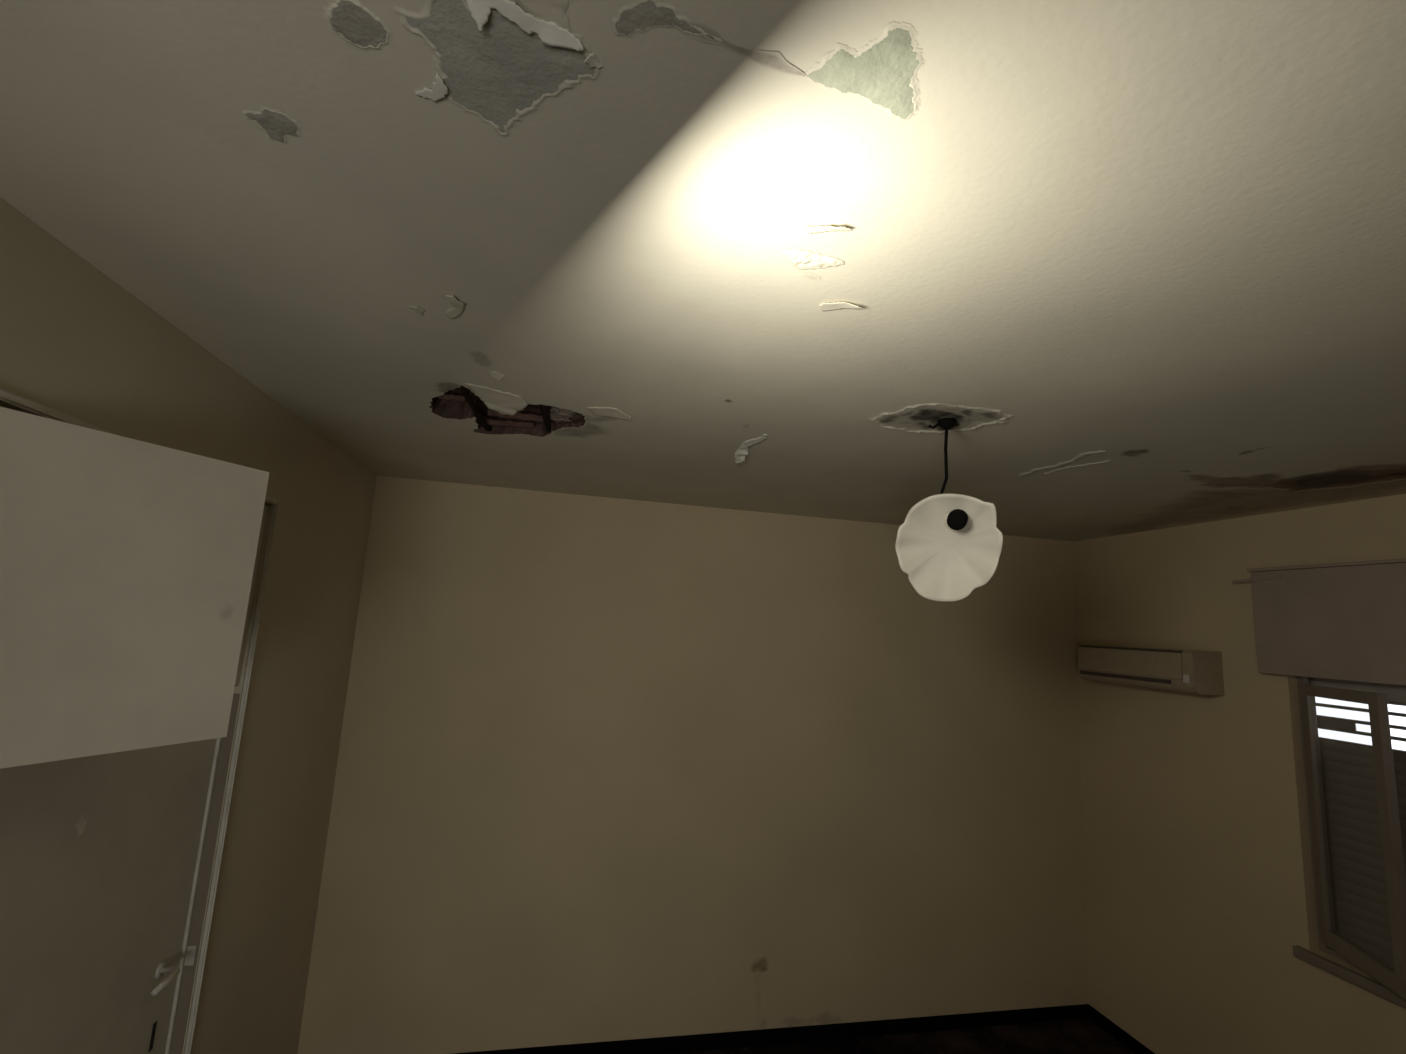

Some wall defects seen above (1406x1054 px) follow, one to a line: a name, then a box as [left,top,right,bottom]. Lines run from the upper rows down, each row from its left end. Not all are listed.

peeling [610,0,725,45]
peeling [321,0,604,137]
peeling [803,22,925,122]
peeling [241,106,305,144]
spalling [429,381,635,441]
damp [1090,479,1406,537]